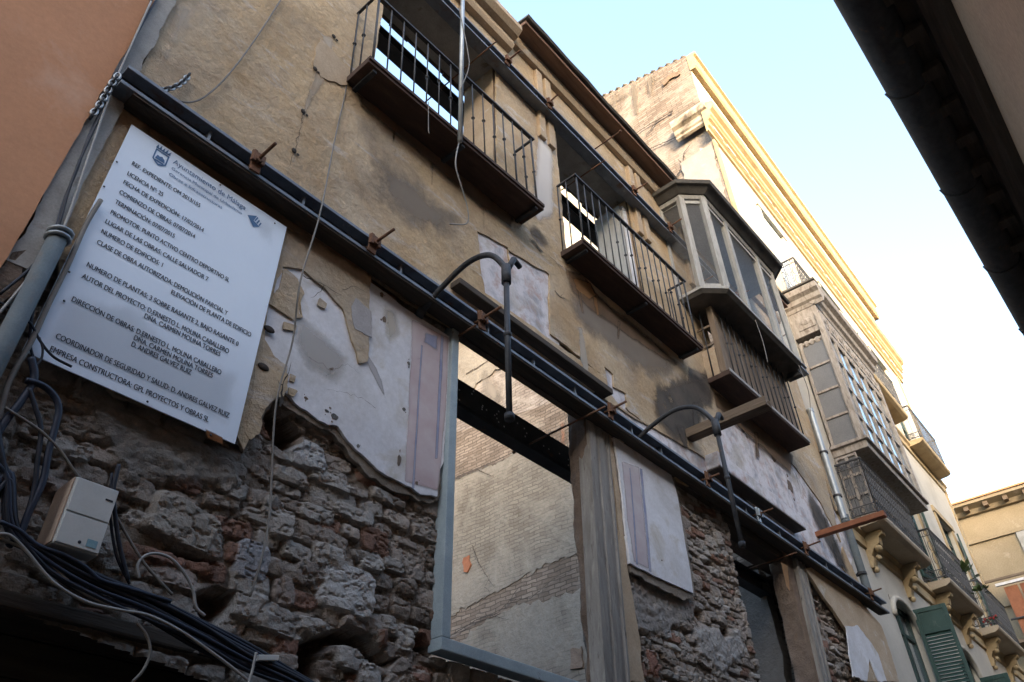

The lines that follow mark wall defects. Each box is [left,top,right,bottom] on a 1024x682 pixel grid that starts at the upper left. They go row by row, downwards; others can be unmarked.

flaking render [351,298,388,338]
damp [575,296,736,448]
flaking render [245,357,308,462]
damp [737,419,793,472]
spalling [162,544,222,566]
hole [193,583,241,626]
hole [296,623,436,682]